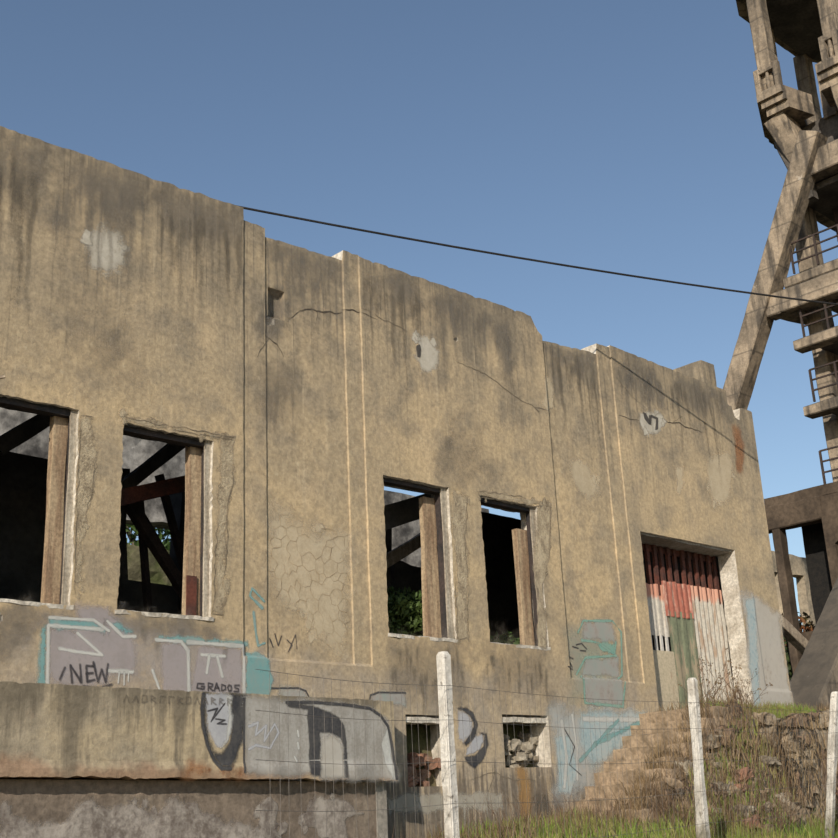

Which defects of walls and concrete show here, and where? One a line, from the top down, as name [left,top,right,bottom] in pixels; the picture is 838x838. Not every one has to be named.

spalling [80,225,128,274]
crack [291,308,406,331]
spalling [412,331,439,372]
crack [458,362,545,413]
spalling [639,410,666,435]
rust [735,429,743,471]
crack [270,501,351,653]